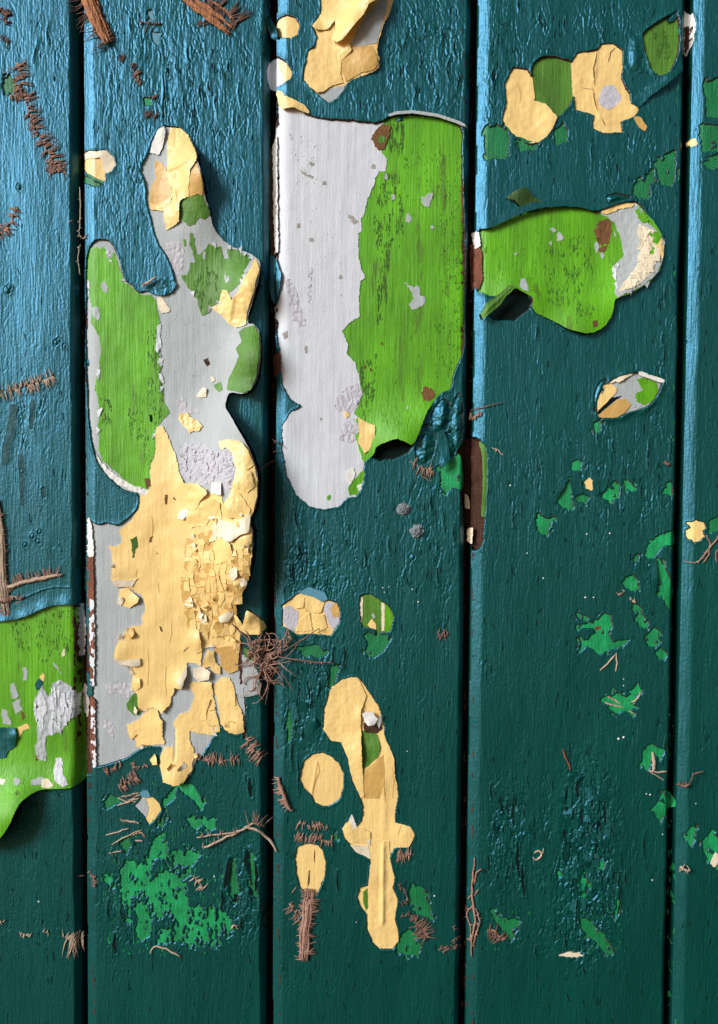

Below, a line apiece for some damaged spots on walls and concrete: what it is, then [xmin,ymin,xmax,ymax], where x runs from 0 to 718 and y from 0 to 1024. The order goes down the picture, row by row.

crack [465,0,566,134]
crack [102,168,142,258]
peeling [266,0,718,517]
crack [0,332,72,420]
crack [484,249,714,678]
peeling [0,126,266,949]
peeling [575,610,628,655]
peeling [631,604,667,660]
crack [178,454,457,1024]
peeling [282,593,436,959]
peeling [600,683,642,717]
crack [12,886,70,984]